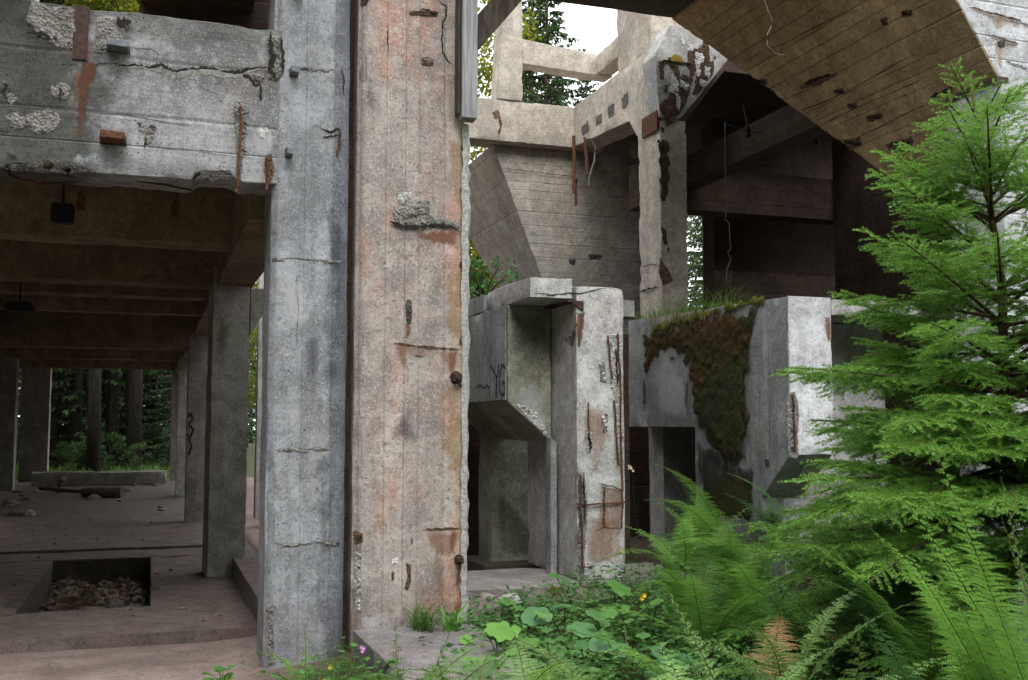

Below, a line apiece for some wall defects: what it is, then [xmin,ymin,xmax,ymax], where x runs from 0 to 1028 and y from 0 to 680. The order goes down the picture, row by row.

spalling [0,82,71,134]
spalling [26,0,76,49]
rust [75,61,96,122]
crack [95,47,267,100]
spalling [267,31,285,80]
crack [439,0,453,67]
peeling [657,35,716,201]
spalling [390,124,471,622]